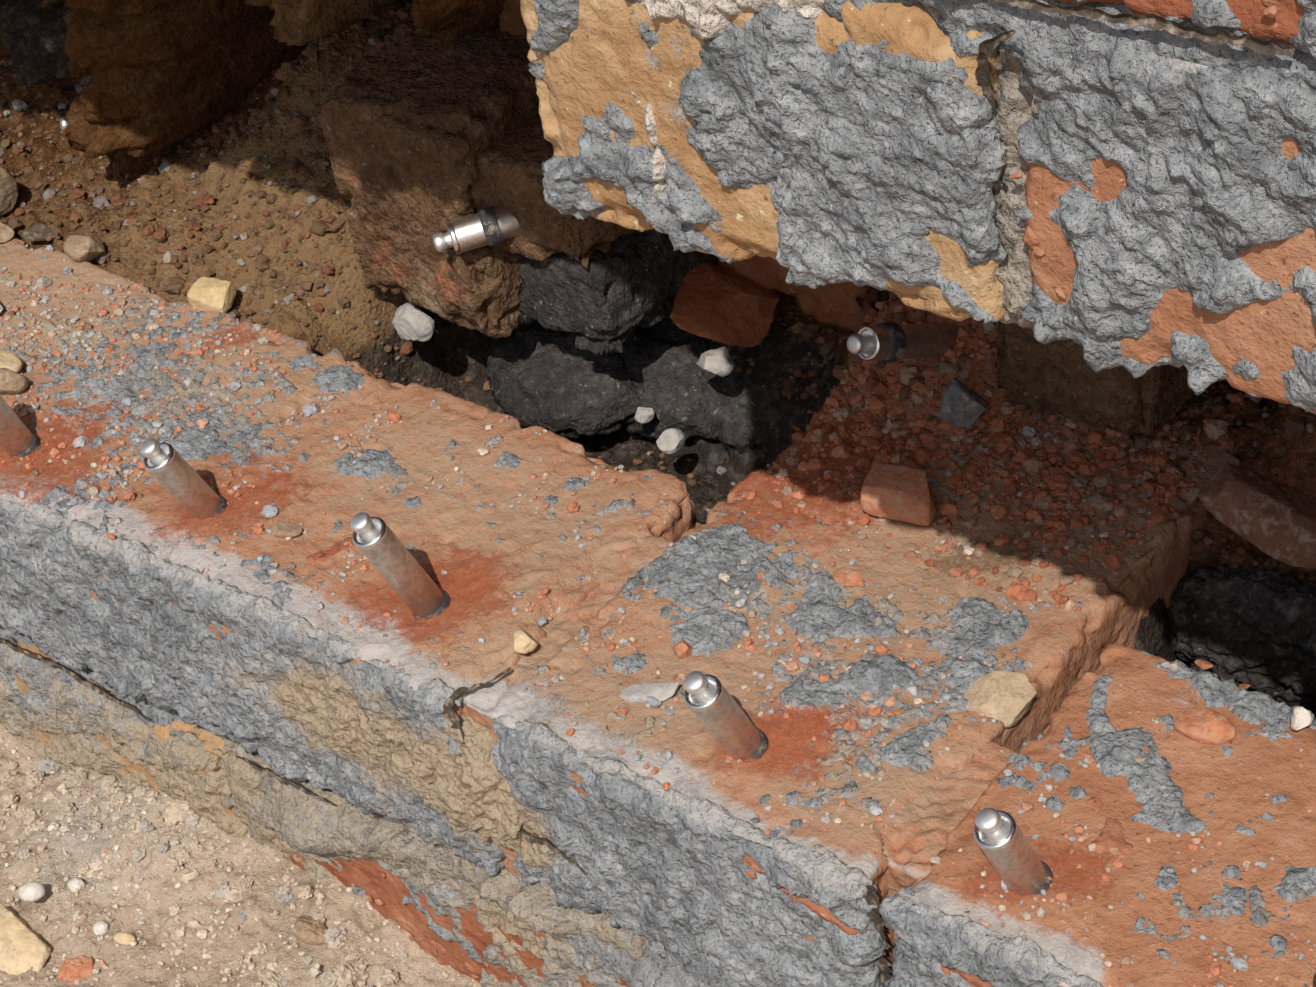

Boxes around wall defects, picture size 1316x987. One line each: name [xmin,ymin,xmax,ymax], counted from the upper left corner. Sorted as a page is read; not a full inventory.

spalling [1260,0,1291,18]
crack [975,0,1295,140]
spalling [427,115,780,355]
crack [992,177,1008,269]
spalling [187,276,236,313]
crack [443,667,511,747]
spalling [394,916,479,979]
crack [864,885,893,987]
spalling [940,962,993,987]